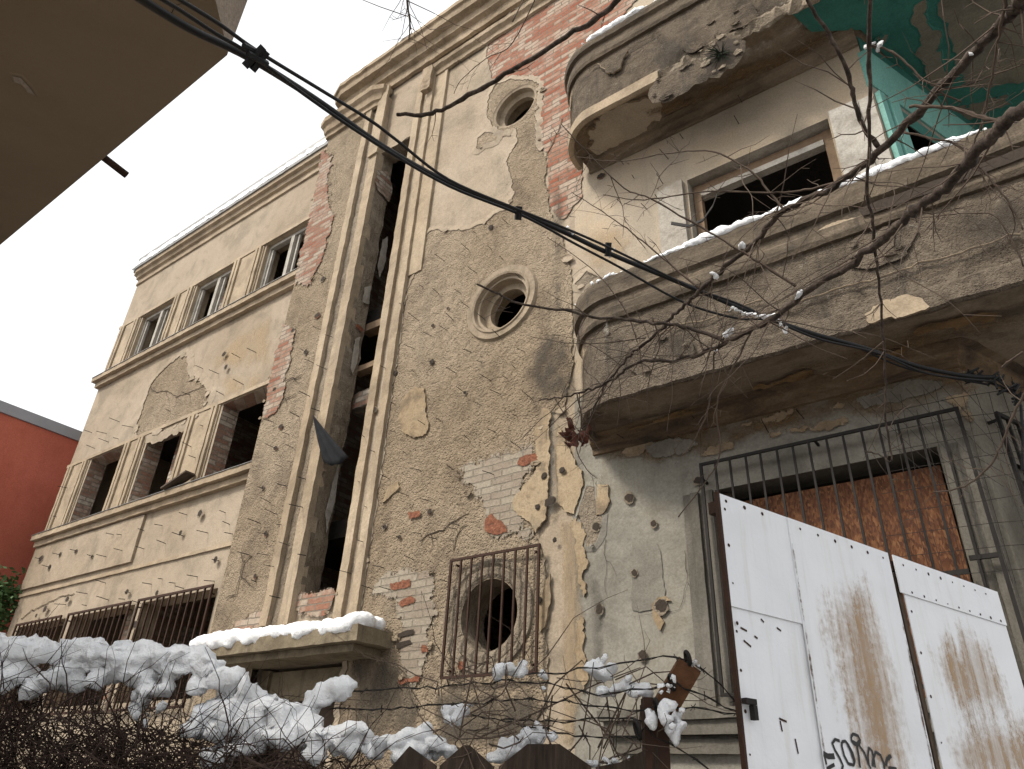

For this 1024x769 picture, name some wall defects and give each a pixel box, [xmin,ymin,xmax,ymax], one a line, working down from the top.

peeling [586,2,759,155]
peeling [909,0,1024,121]
flaking render [294,150,334,286]
peeling [865,294,930,325]
peeling [132,346,217,444]
flaking render [258,321,307,429]
spalling [324,0,636,769]
peeling [621,409,796,458]
flaking render [295,587,338,618]
rust [839,594,901,769]
rust [945,639,1001,707]